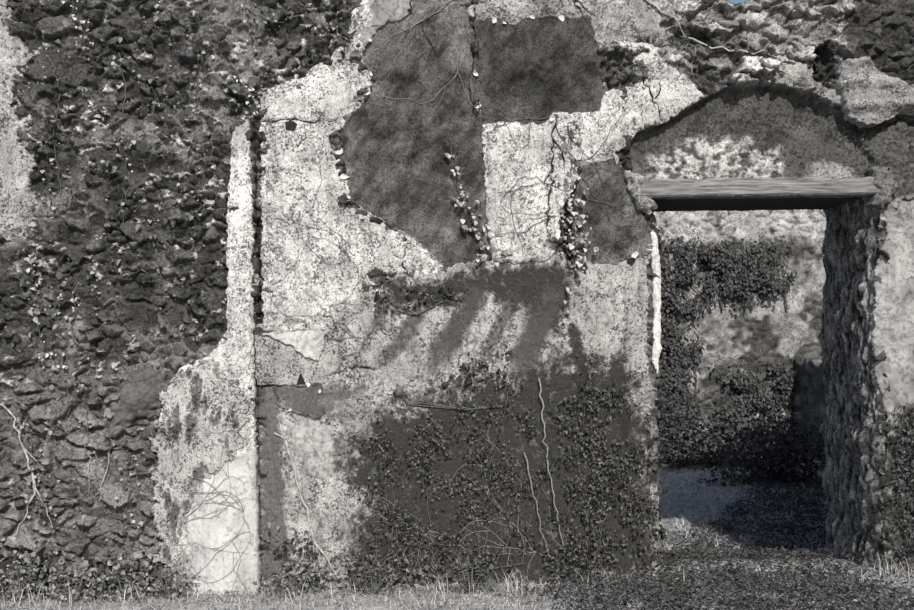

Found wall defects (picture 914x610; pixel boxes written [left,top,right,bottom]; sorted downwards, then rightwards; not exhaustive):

crack [573,0,598,21]
crack [544,117,565,244]